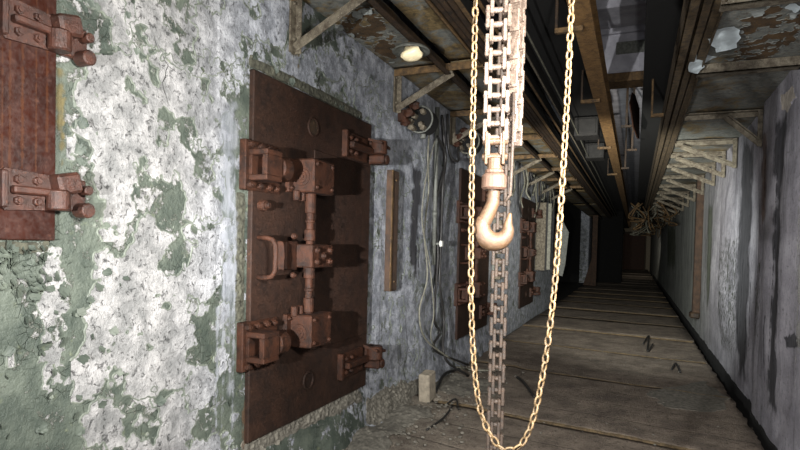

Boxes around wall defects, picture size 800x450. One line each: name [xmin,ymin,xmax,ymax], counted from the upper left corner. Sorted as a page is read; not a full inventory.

peeling [688,3,800,74]
peeling [0,0,433,450]
peeling [436,158,457,352]
damp [704,115,800,410]